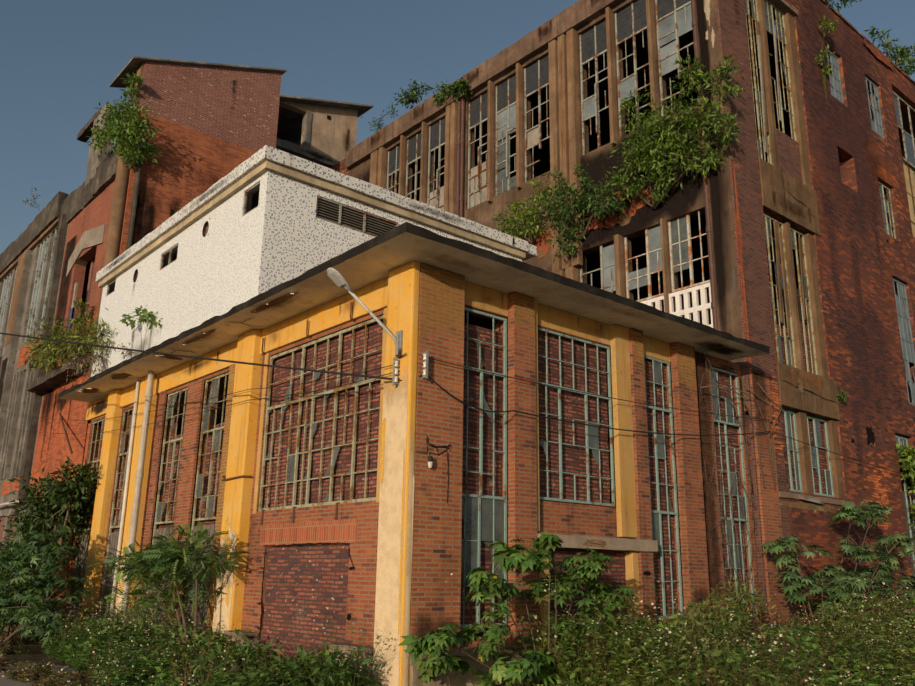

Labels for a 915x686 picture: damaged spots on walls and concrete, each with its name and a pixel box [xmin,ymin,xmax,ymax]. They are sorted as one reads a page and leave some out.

peeling [703,0,715,48]
water stain [798,0,884,296]
water stain [132,191,154,244]
peeling [212,517,237,635]